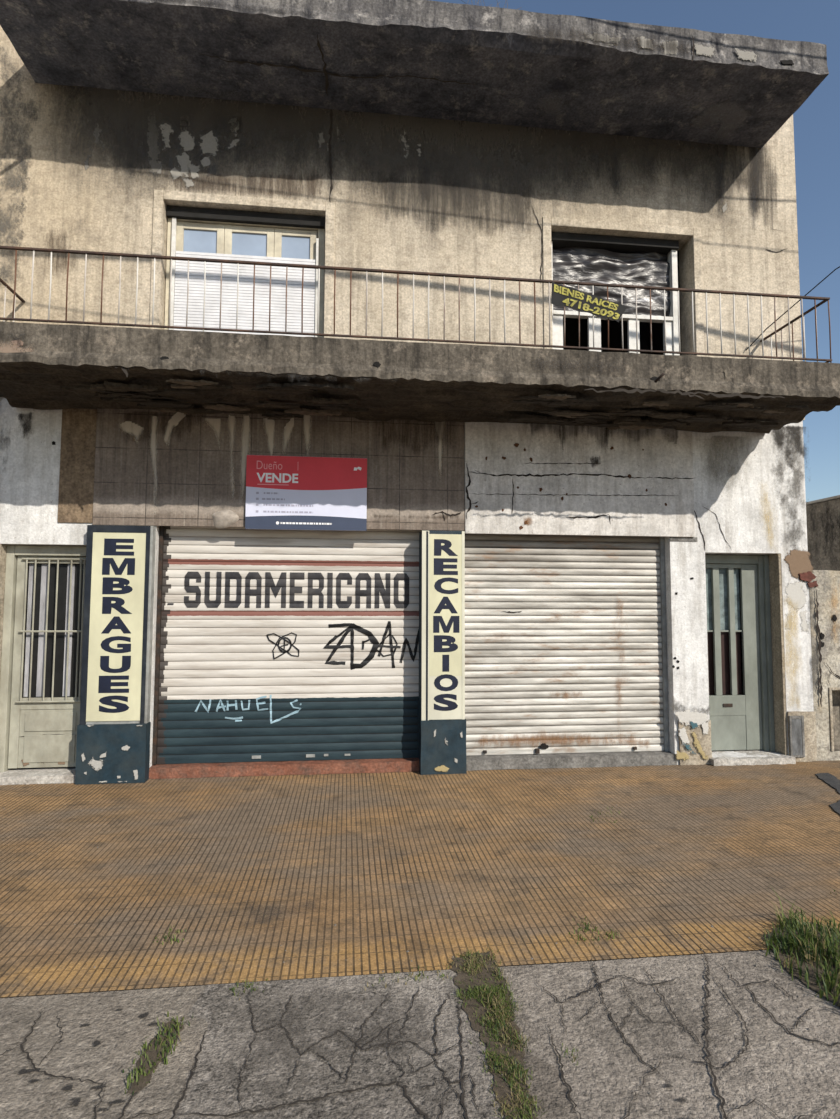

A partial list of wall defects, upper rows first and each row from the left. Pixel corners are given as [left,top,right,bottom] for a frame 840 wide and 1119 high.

water stain [0,59,37,284]
peeling [146,117,239,189]
water stain [175,174,317,196]
water stain [386,160,529,230]
water stain [694,103,773,214]
crack [433,462,731,549]
peeling [784,549,818,587]
peeling [81,753,138,783]
peeling [675,709,710,761]